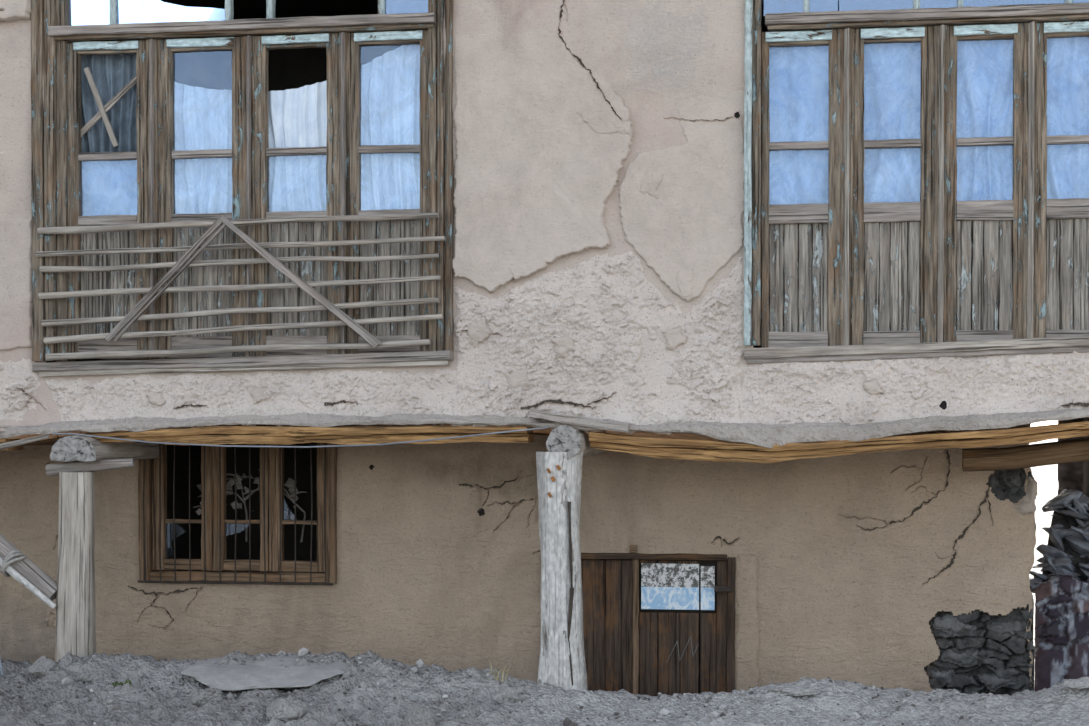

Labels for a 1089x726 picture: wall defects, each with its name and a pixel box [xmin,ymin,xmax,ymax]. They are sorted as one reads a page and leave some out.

crack [557,0,622,120]
spalling [0,29,1089,435]
crack [459,470,541,555]
crack [838,449,952,532]
crack [922,486,994,585]
spalling [986,468,1038,516]
crack [128,585,203,630]
spalling [924,599,1035,696]